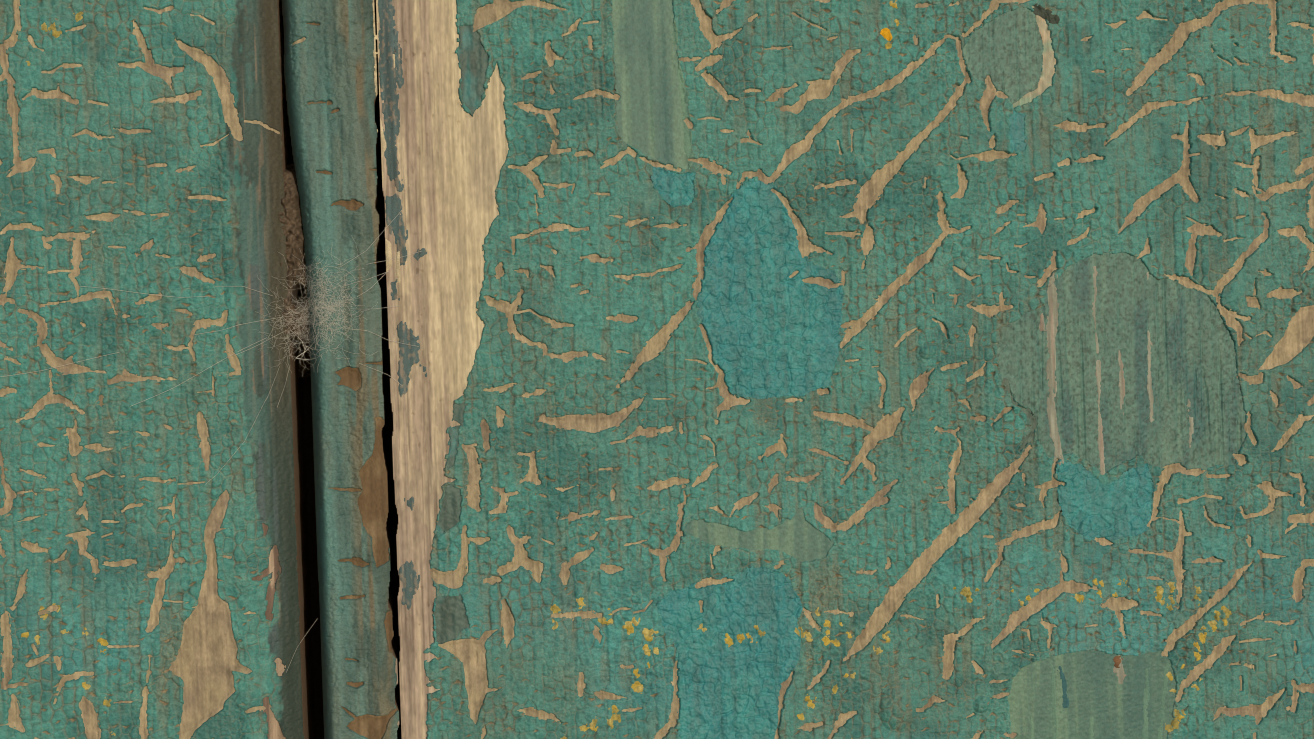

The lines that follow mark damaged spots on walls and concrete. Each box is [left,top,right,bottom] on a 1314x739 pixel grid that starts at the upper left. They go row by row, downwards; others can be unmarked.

crack [0,0,286,739]
peeling [335,367,362,391]
peeling [341,0,567,739]
crack [430,0,1314,739]
peeling [1258,305,1314,370]
peeling [559,561,570,585]
peeling [169,490,252,739]
peeling [577,672,586,697]
water stain [1057,666,1069,708]